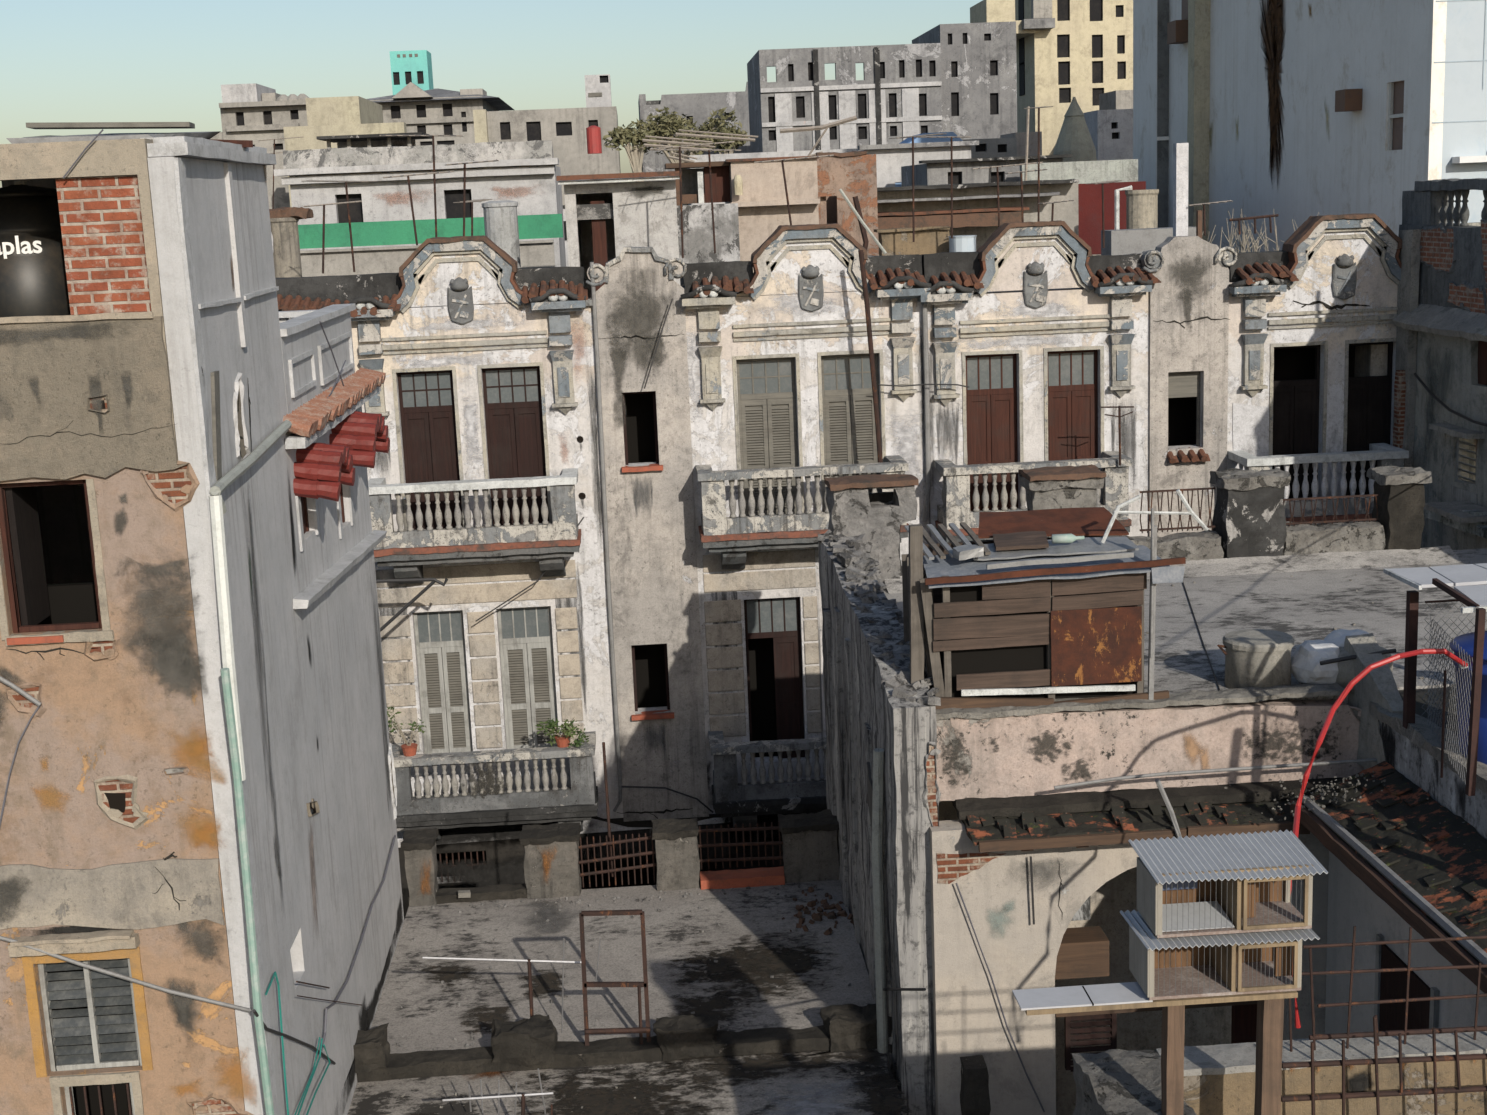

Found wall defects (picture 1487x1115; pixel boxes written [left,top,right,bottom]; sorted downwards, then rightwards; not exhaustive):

rust [1261,0,1284,174]
water stain [608,272,663,425]
crack [1155,316,1230,329]
crack [1293,300,1369,314]
water stain [590,383,601,511]
flaking render [140,461,200,512]
water stain [127,561,205,695]
spalling [3,682,48,718]
water stain [942,732,972,785]
water stain [1029,730,1095,781]
spalling [94,775,149,830]
flaking render [186,1093,254,1115]